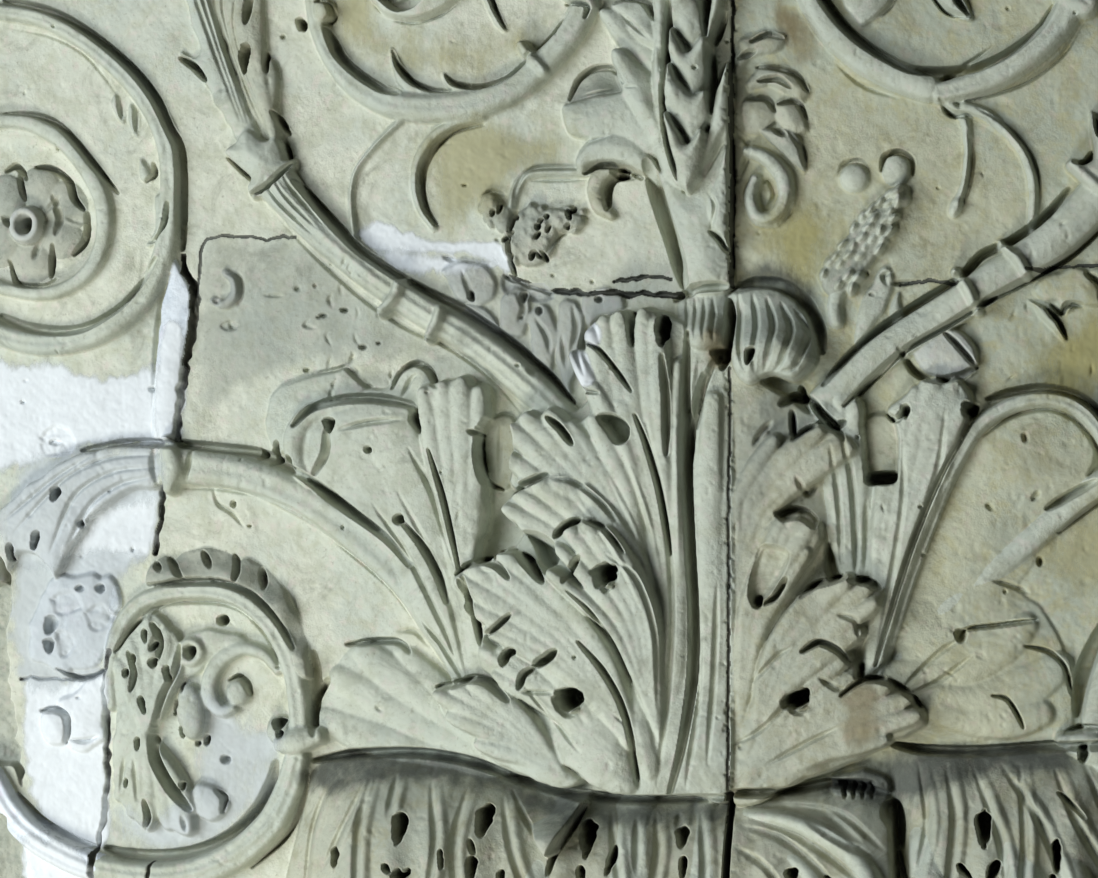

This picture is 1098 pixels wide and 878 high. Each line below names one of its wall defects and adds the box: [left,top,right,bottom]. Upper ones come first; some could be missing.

crack [509,274,685,300]
crack [168,234,297,443]
crack [153,485,166,556]
crack [64,648,112,681]
crack [105,716,113,786]
crack [87,846,101,868]
crack [146,861,156,878]